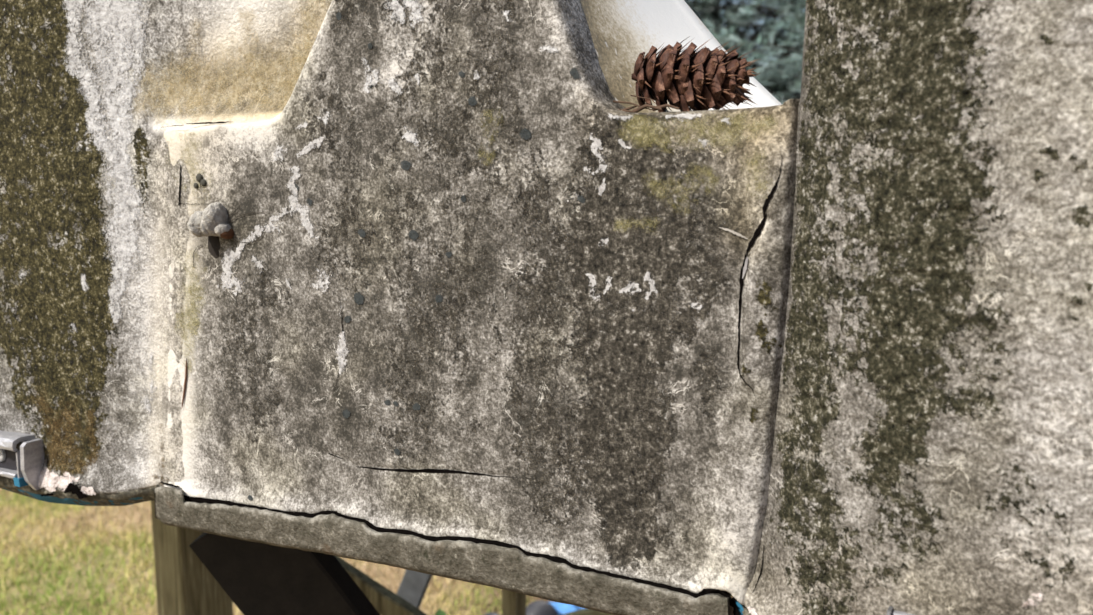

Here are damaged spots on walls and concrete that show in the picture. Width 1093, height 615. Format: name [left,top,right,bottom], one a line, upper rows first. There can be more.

leakage [959,0,994,115]
leakage [0,196,74,477]
leakage [71,156,121,339]
crack [719,156,782,399]
leakage [769,0,948,615]
leakage [946,122,1006,246]
leakage [944,283,1017,430]
spalling [0,466,159,506]
crack [329,453,529,479]
crack [156,481,764,615]